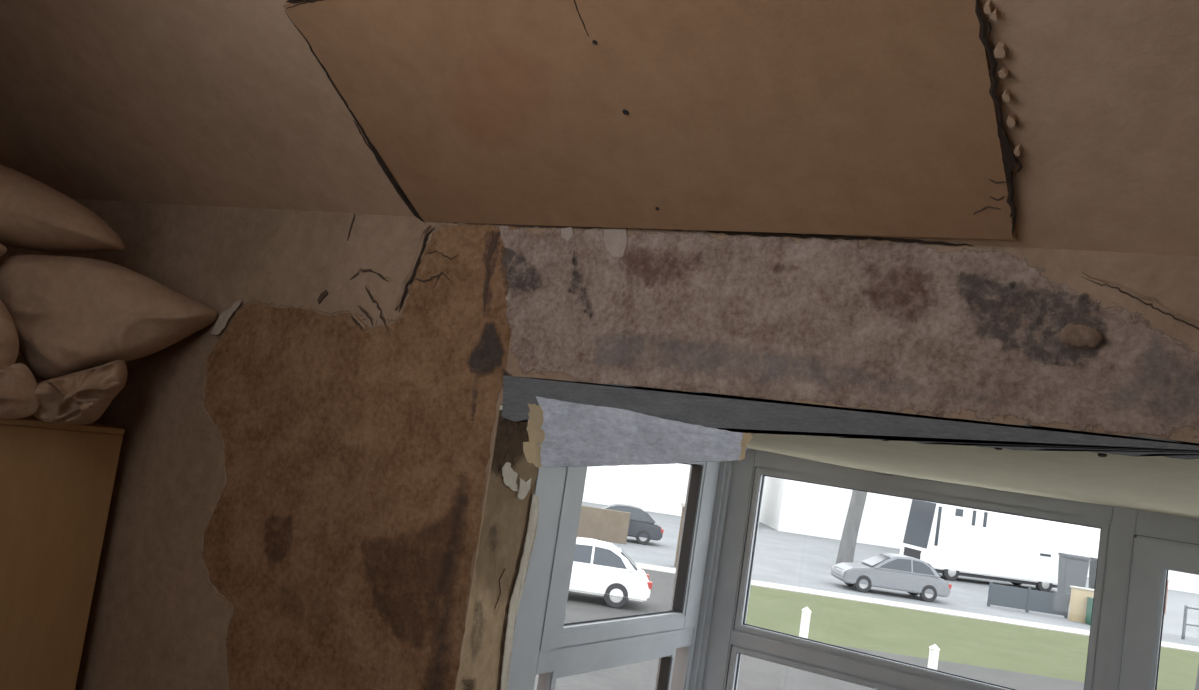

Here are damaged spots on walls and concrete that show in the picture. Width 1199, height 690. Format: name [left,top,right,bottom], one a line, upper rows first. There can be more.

crack [285,0,603,312]
water stain [469,323,511,376]
peeling [199,222,1199,690]
crack [671,229,973,246]
crack [973,0,1022,238]
water stain [959,274,1108,363]